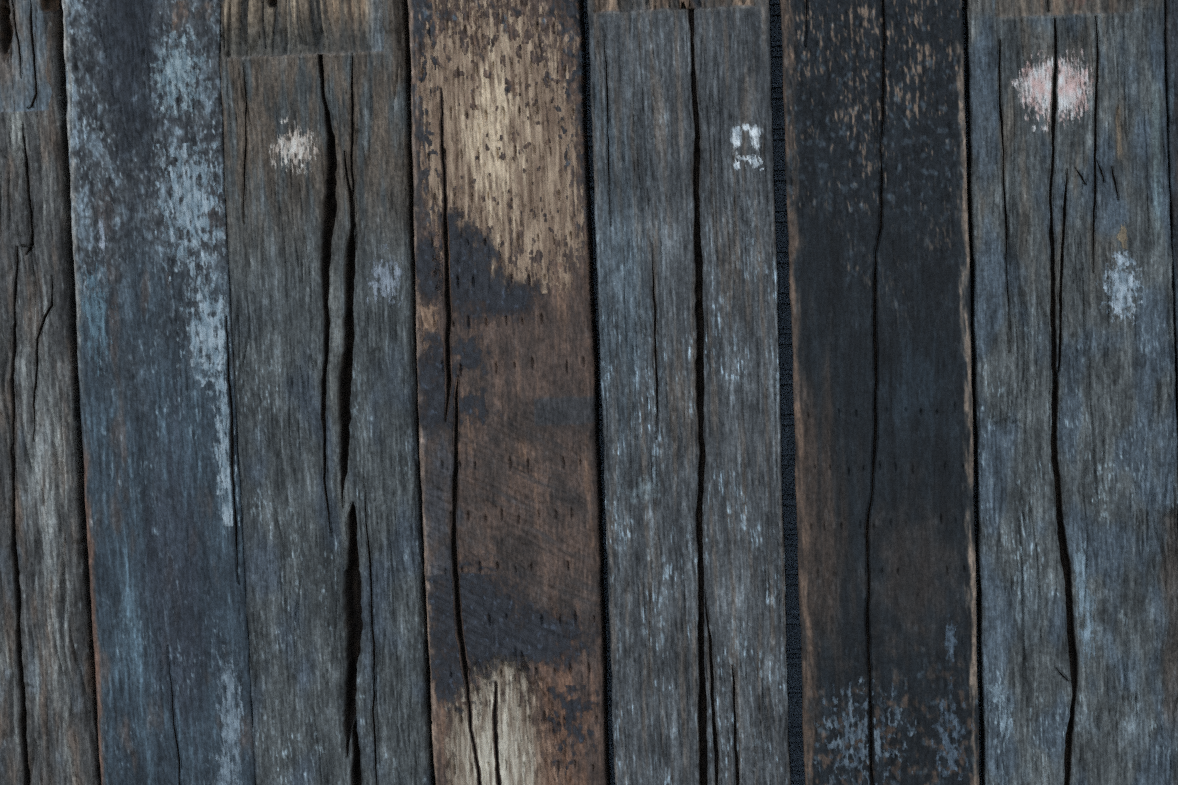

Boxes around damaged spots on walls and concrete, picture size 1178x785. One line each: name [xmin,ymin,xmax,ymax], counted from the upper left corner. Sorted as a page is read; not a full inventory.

crack [7,0,55,785]
crack [316,53,378,785]
crack [440,88,502,785]
crack [651,241,660,439]
crack [686,9,741,785]
crack [864,0,887,785]
crack [1046,0,1119,785]